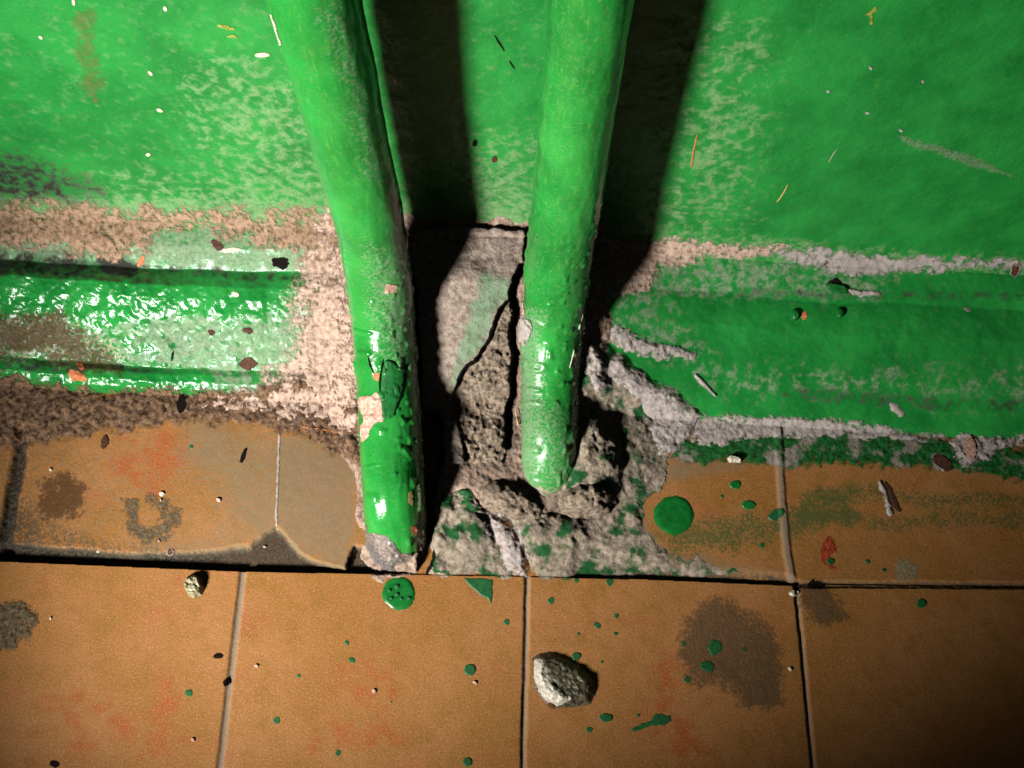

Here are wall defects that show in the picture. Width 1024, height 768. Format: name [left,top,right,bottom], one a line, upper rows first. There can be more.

peeling [211,239,241,253]
peeling [68,362,87,382]
spalling [239,208,384,442]
crack [413,276,445,468]
crack [454,267,524,442]
spalling [458,301,524,464]
spalling [561,367,670,512]
leakage [38,472,86,521]
leakage [120,493,181,545]
crack [426,550,436,574]
leakage [0,600,39,651]
leakage [679,598,781,707]